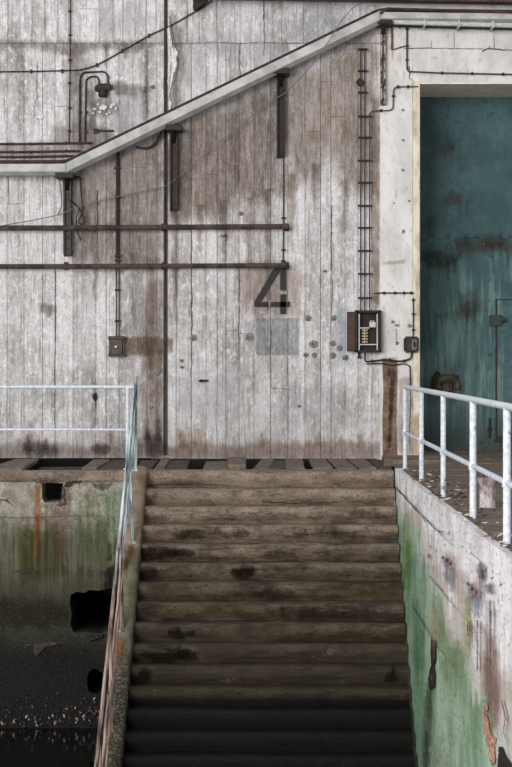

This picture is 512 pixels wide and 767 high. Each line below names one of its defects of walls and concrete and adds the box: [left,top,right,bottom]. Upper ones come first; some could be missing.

peeling [167,22,178,110]
spalling [482,703,512,767]